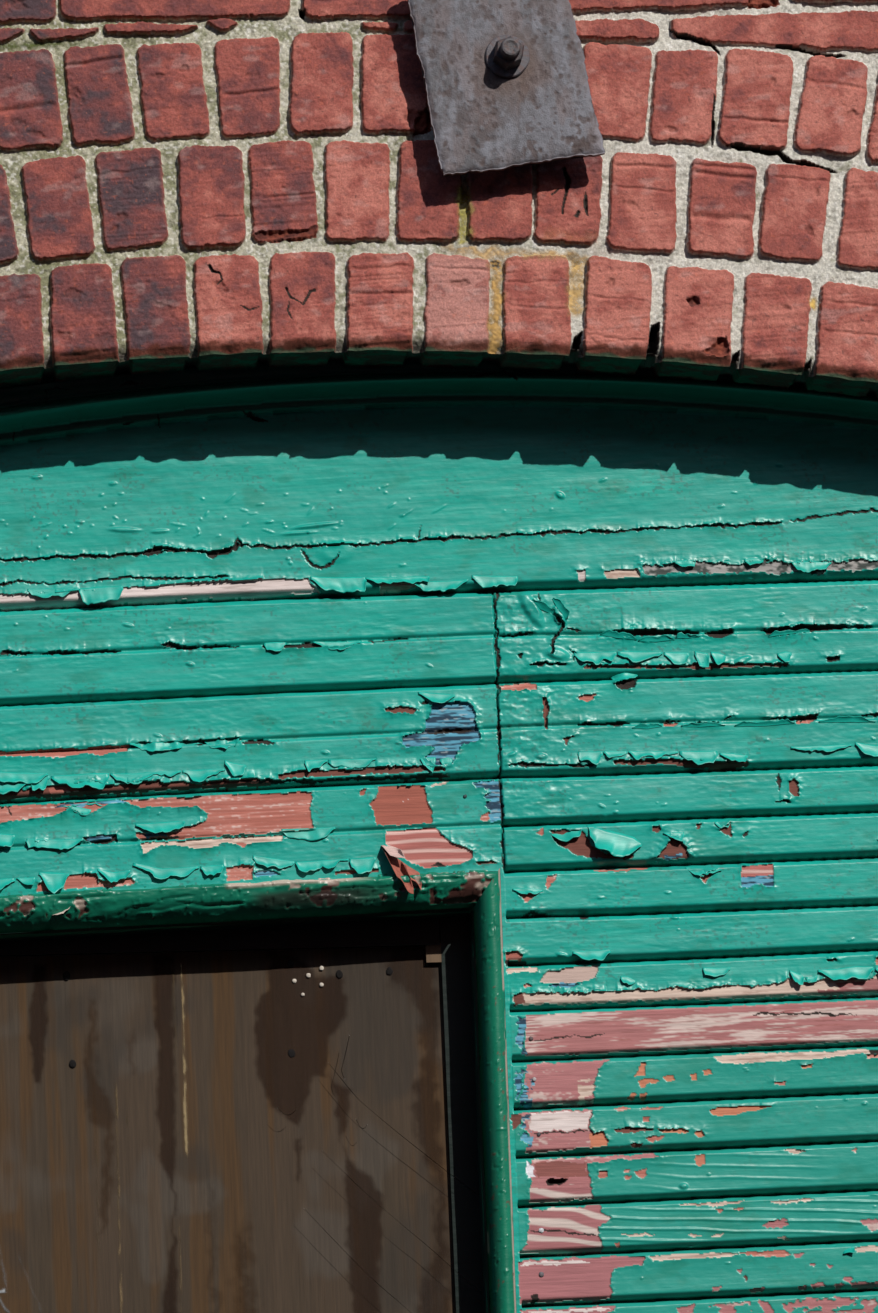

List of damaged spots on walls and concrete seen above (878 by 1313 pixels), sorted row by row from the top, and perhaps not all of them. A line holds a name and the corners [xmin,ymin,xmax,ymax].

crack [669,29,721,56]
crack [775,44,846,59]
crack [208,264,317,319]
peeling [0,575,518,612]
crack [0,507,878,587]
peeling [604,558,878,579]
peeling [574,628,792,690]
peeling [509,712,878,772]
peeling [0,692,496,894]
damp [256,955,345,1122]
peeling [505,949,878,1313]
damp [347,1161,381,1313]